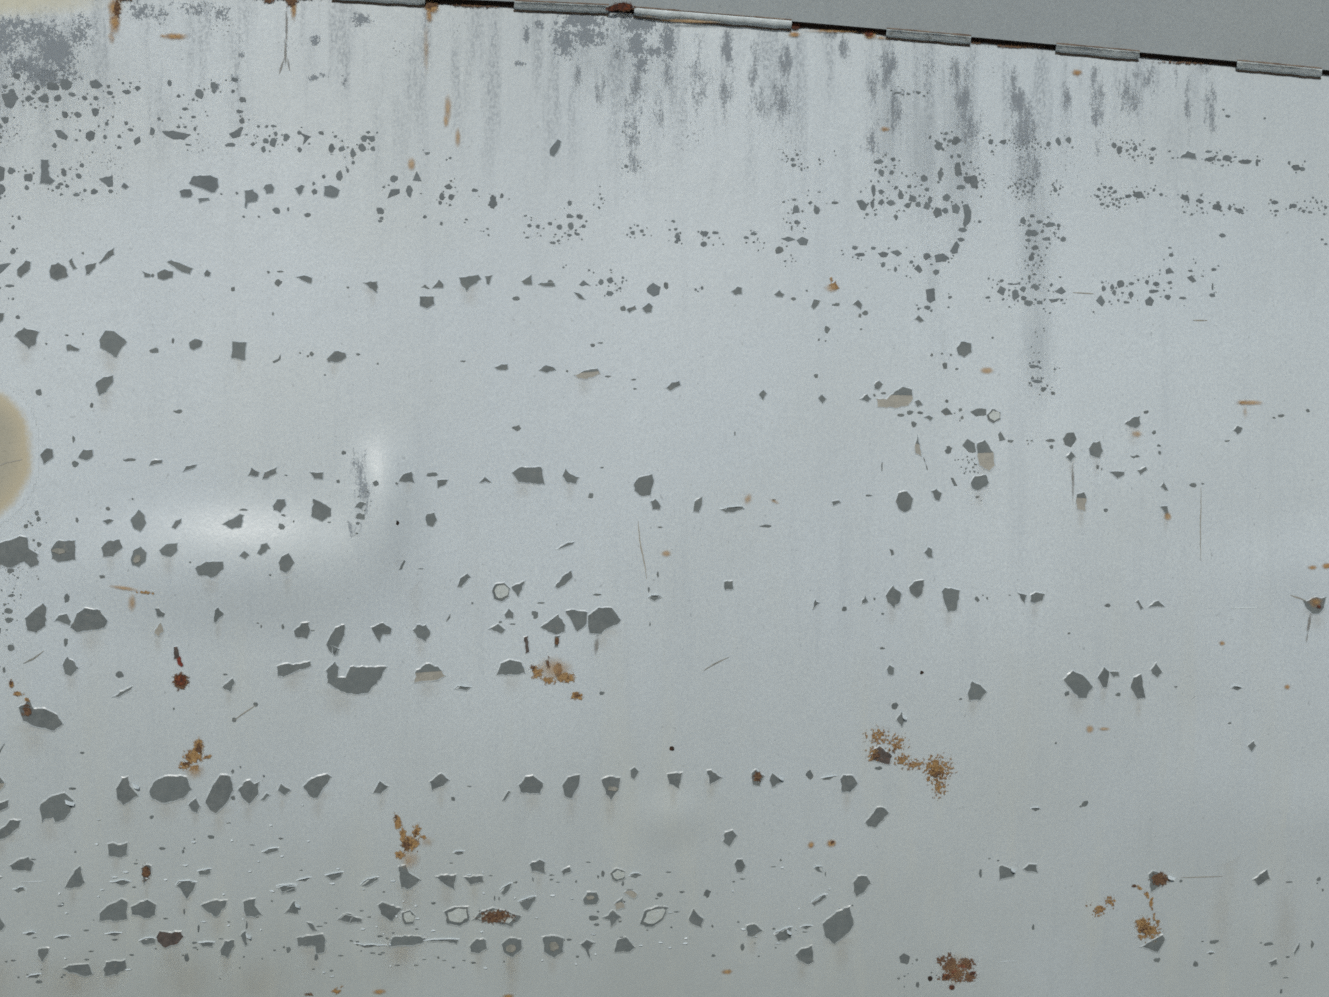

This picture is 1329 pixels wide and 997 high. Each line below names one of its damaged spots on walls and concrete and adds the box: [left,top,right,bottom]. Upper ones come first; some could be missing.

corrosion [332,0,801,36]
peeling [0,73,378,204]
peeling [841,131,986,323]
peeling [0,510,109,651]
corrosion [172,657,189,691]
peeling [276,624,388,696]
corrosion [530,656,583,700]
peeling [495,606,622,677]
corrosion [863,725,958,798]
peeling [114,772,333,823]
corrosion [394,814,427,862]
corrosion [937,952,979,990]